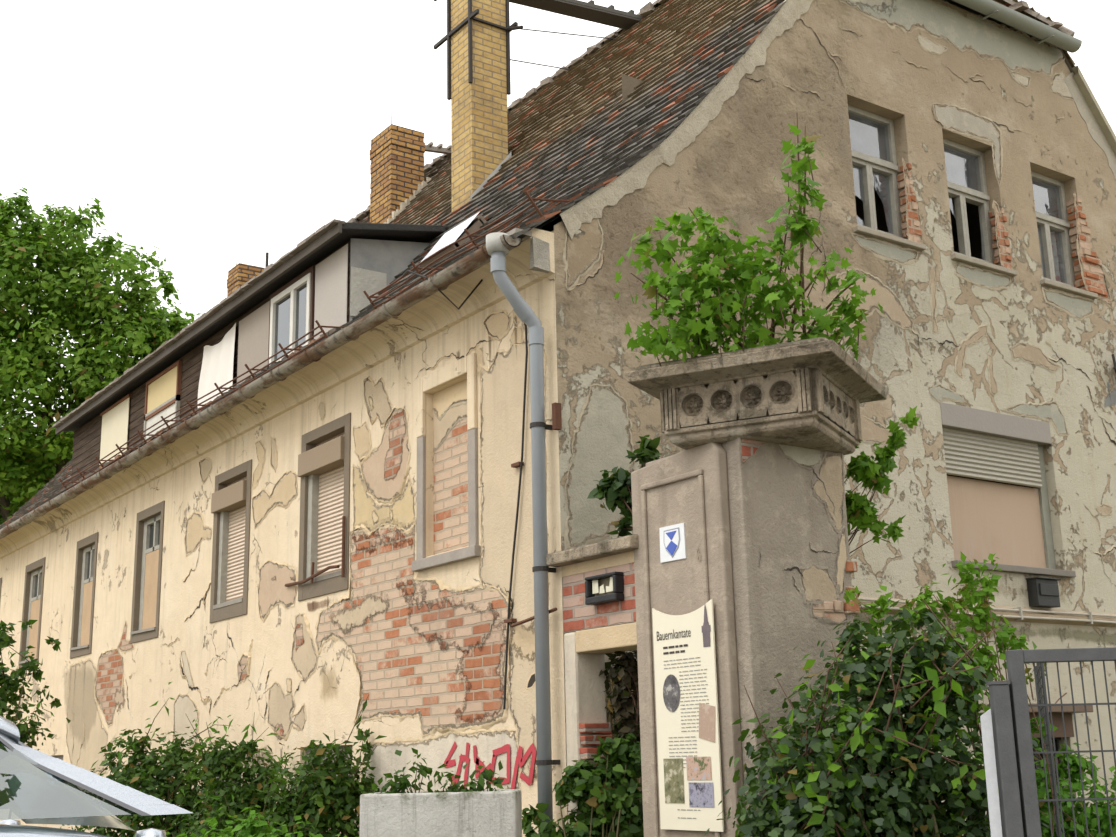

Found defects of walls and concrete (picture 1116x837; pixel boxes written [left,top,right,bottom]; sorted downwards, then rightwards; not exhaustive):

crack [747,18,862,103]
crack [417,340,489,377]
flaking render [564,384,635,549]
crack [811,213,828,333]
peeling [836,269,913,350]
peeling [859,413,892,448]
crack [1045,341,1116,445]
flaking render [185,511,212,557]
flaking render [251,309,548,793]
peeling [66,620,134,775]
peeling [173,650,199,751]
spalling [579,723,613,767]